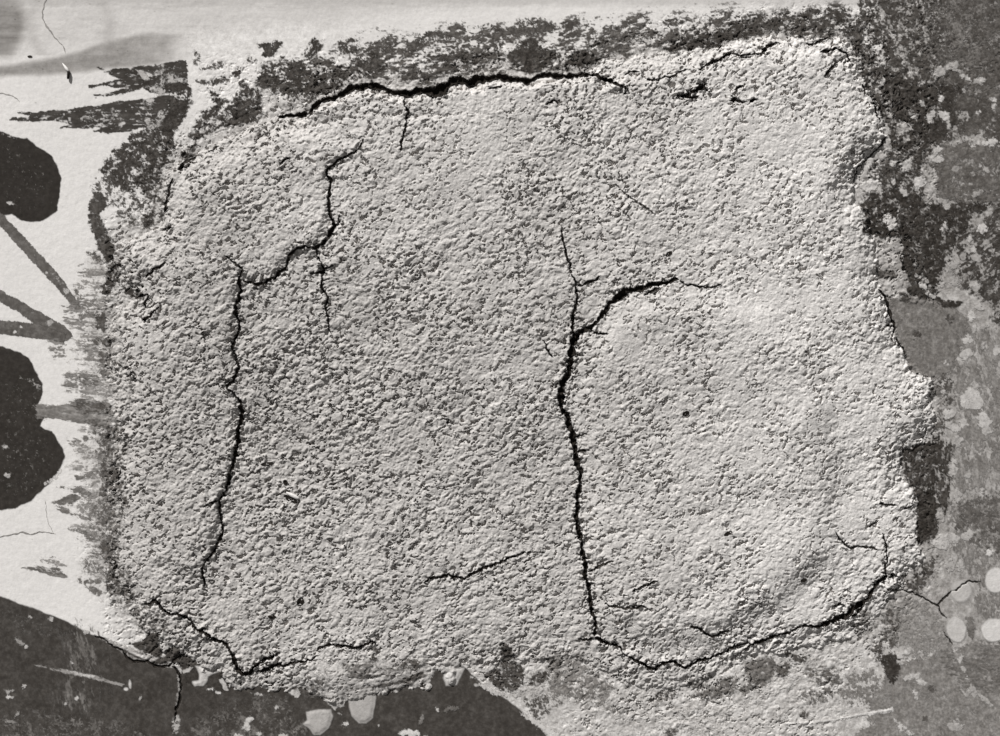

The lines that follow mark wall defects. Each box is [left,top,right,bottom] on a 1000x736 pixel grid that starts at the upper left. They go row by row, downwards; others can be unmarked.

crack [278,42,779,151]
crack [163,146,217,230]
crack [201,139,364,588]
crack [544,226,981,671]
crack [424,551,544,583]
crack [143,599,376,676]